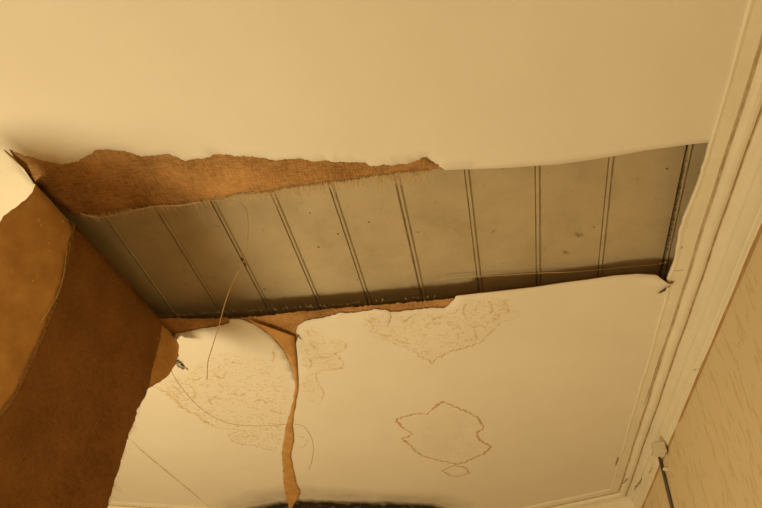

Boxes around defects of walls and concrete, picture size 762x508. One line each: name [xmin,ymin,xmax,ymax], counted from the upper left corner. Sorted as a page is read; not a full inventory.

peeling [0,150,179,508]
peeling [246,319,300,508]
leakage [396,401,491,476]